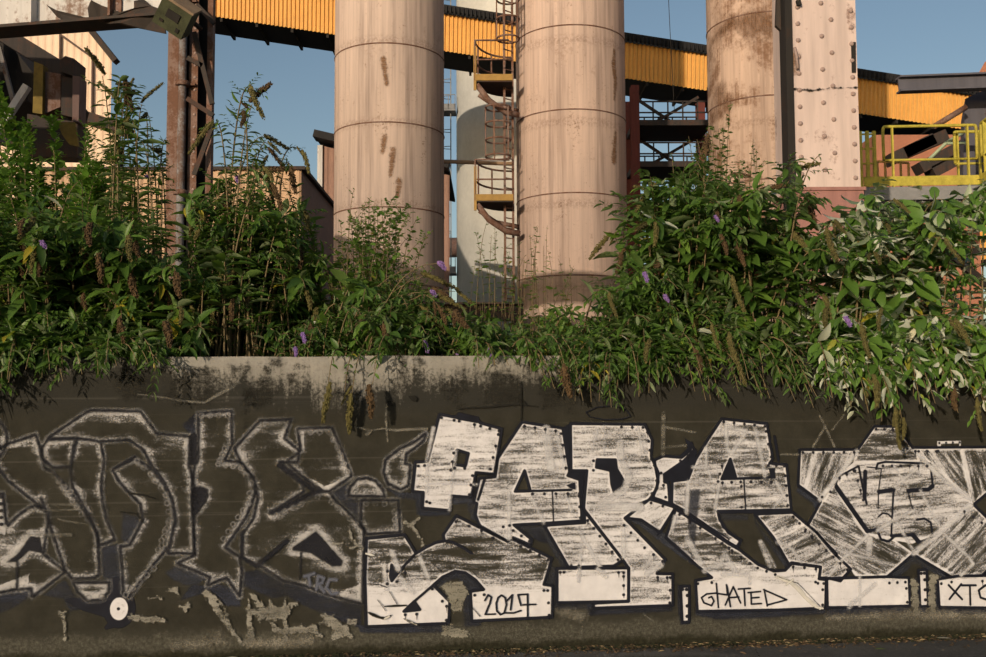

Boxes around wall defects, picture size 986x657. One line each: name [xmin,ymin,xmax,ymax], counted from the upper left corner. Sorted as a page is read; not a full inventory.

rust [709,12,772,52]
rust [381,135,402,197]
damp [166,366,214,405]
damp [232,357,303,409]
damp [484,370,521,405]
peeling [148,587,191,613]
peeling [173,589,357,649]